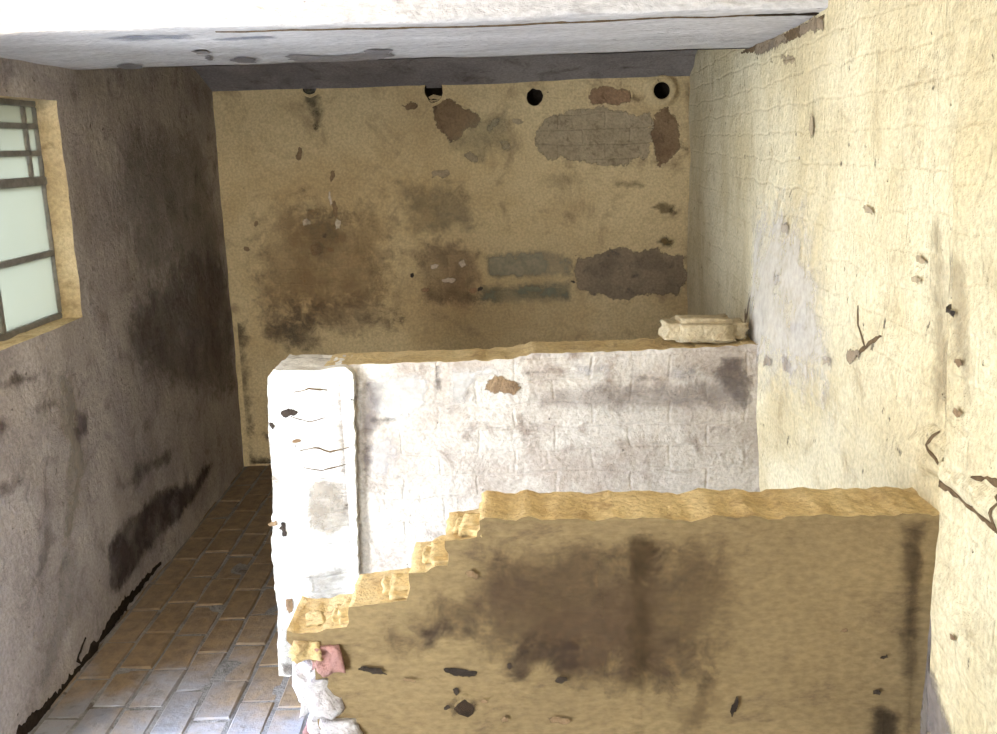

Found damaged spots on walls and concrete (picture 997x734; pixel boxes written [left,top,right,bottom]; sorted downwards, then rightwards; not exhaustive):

flaking render [512,82,684,170]
leakage [272,210,377,346]
flaking render [421,237,687,302]
crack [846,305,881,364]
flaking render [280,408,298,418]
flaking render [453,369,521,397]
crack [925,430,997,534]
leakage [108,465,210,590]
leakage [906,529,920,587]
leakage [472,543,694,689]
spalling [288,640,363,734]
leakage [873,708,896,734]